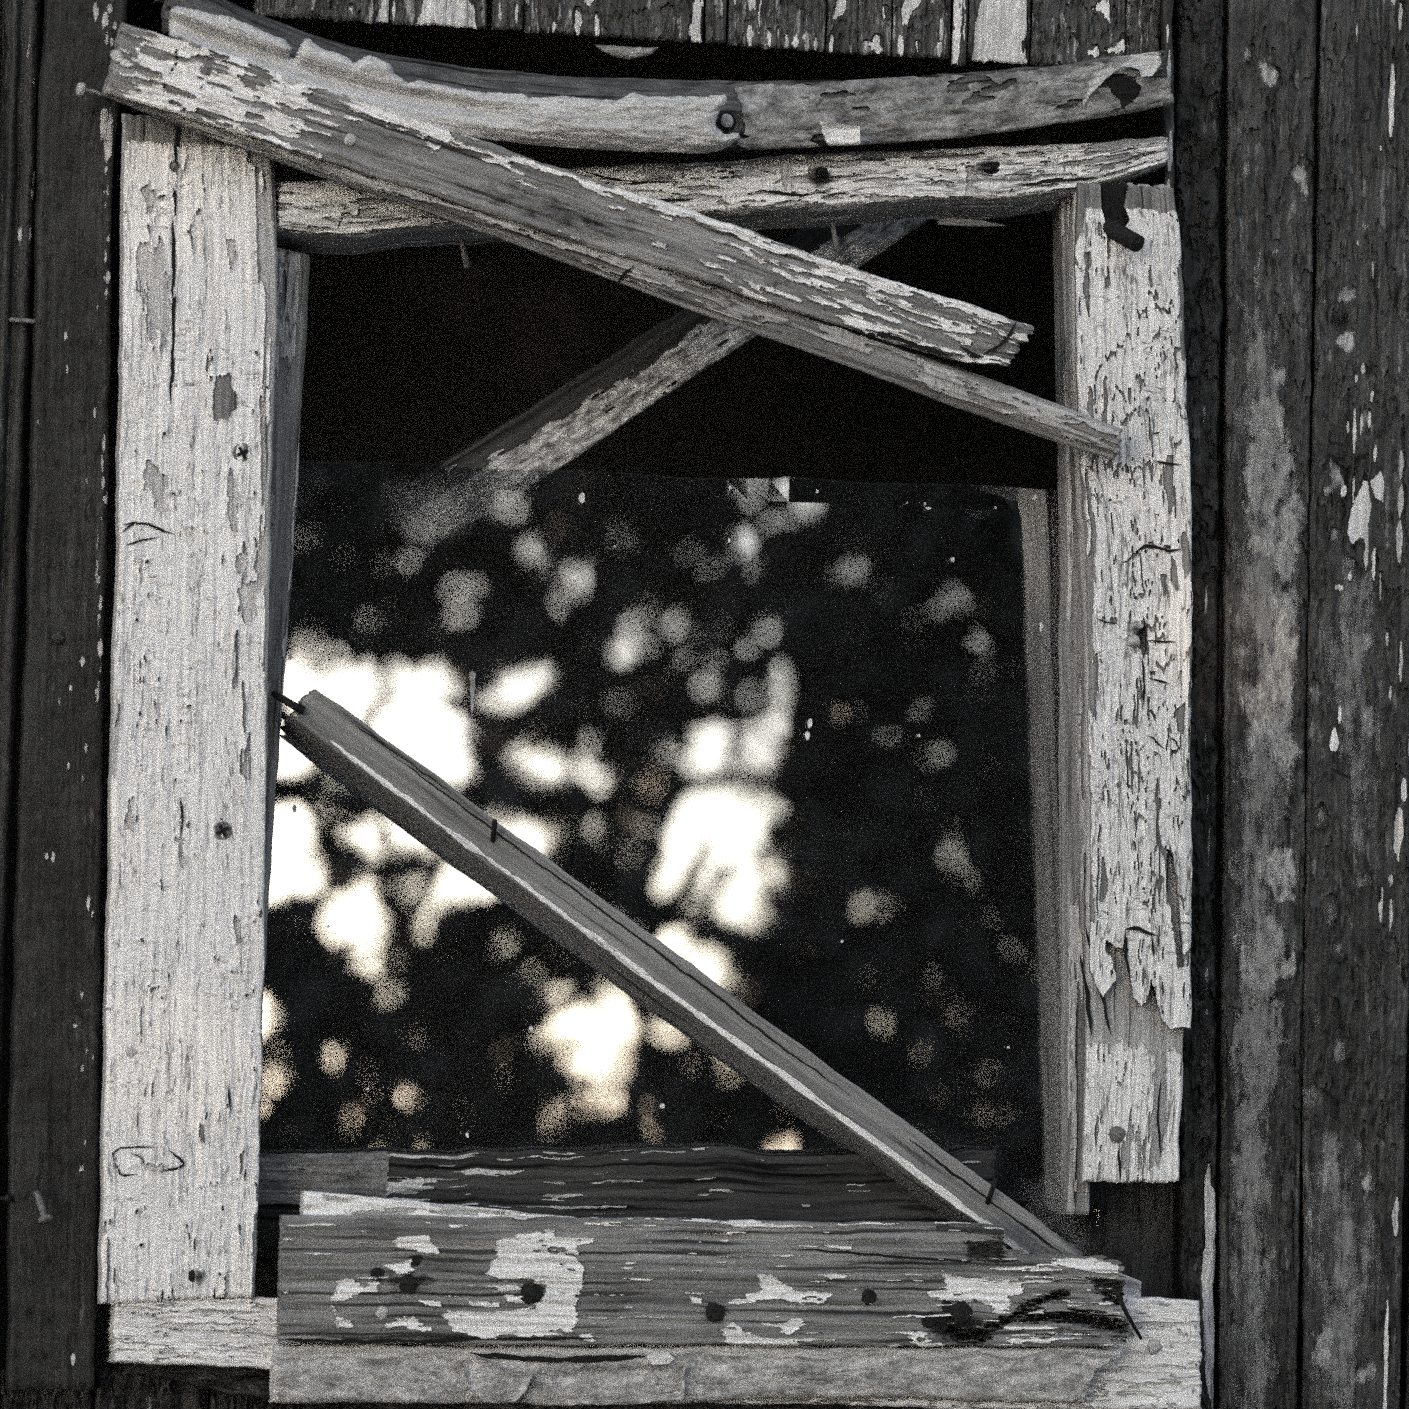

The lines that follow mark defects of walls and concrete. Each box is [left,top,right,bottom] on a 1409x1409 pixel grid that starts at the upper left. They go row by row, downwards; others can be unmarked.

peeling [416,0,477,30]
peeling [820,122,861,146]
peeling [864,0,1027,65]
peeling [1083,24,1171,109]
crack [1153,432,1182,465]
crack [1121,544,1181,564]
crack [1095,612,1180,750]
peeling [1321,445,1404,850]
peeling [1228,305,1307,1409]
peeling [1357,778,1407,932]
peeling [1201,1163,1216,1409]
peeling [1306,1132,1399,1409]